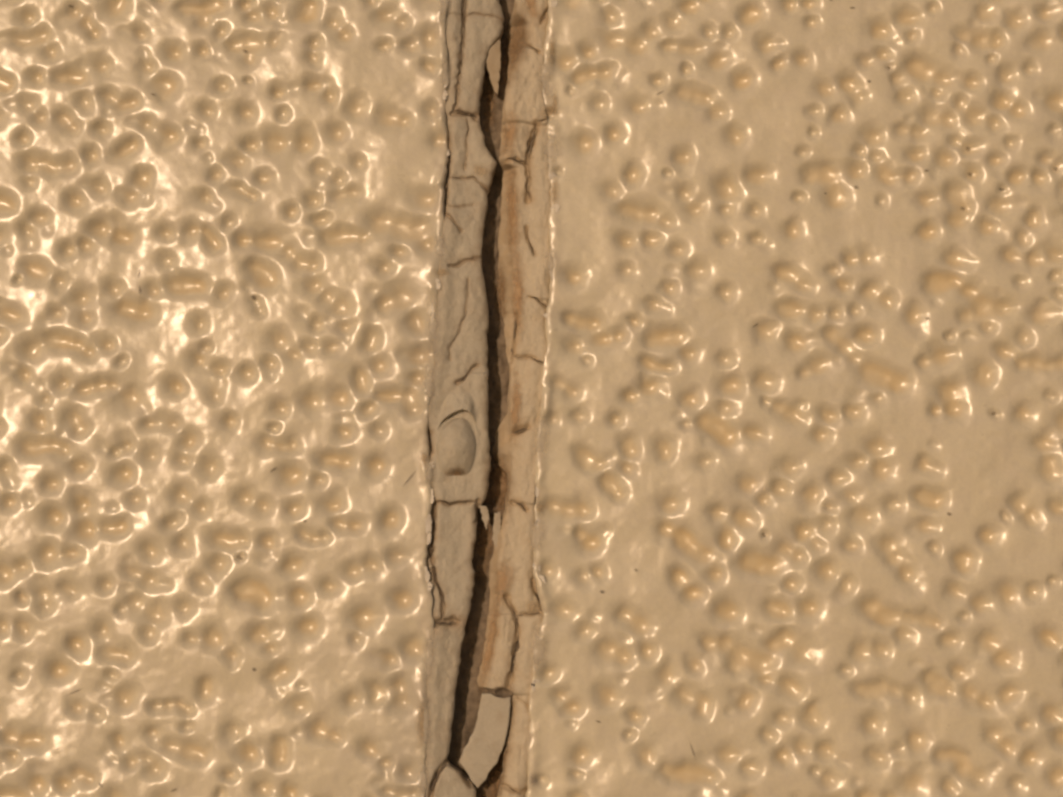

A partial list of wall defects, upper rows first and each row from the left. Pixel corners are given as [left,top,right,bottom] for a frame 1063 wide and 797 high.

crack [429,0,547,797]